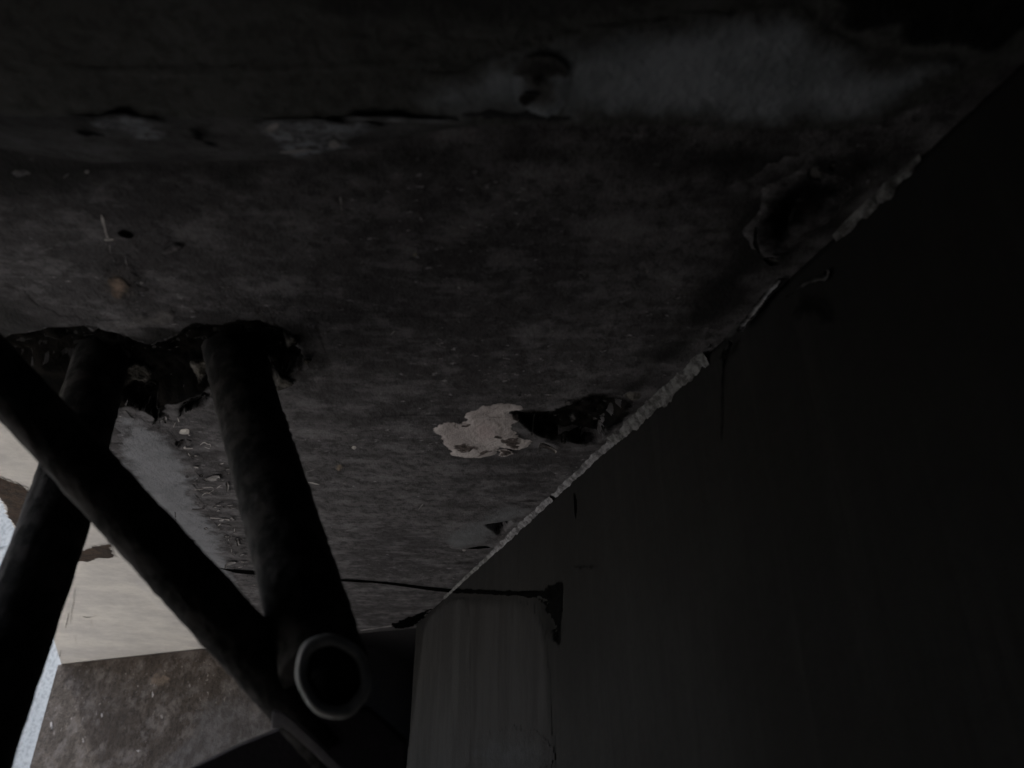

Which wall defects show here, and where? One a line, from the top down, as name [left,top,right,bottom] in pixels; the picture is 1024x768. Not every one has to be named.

spalling [5,305,311,586]
spalling [432,391,643,458]